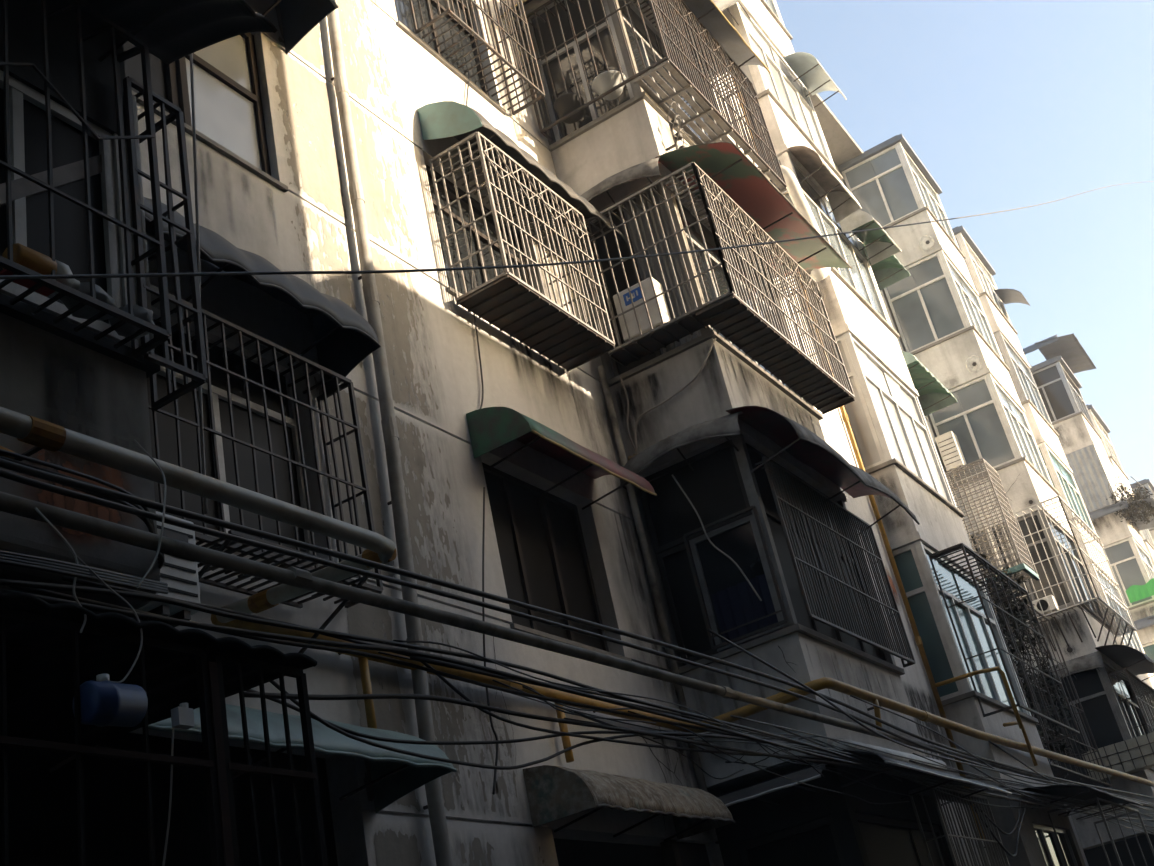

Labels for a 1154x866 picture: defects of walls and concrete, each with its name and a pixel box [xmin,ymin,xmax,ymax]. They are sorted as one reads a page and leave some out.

peeling [270,0,357,311]
peeling [336,0,467,591]
corrosion [25,444,129,524]
peeling [314,377,386,537]
peeling [374,829,422,866]